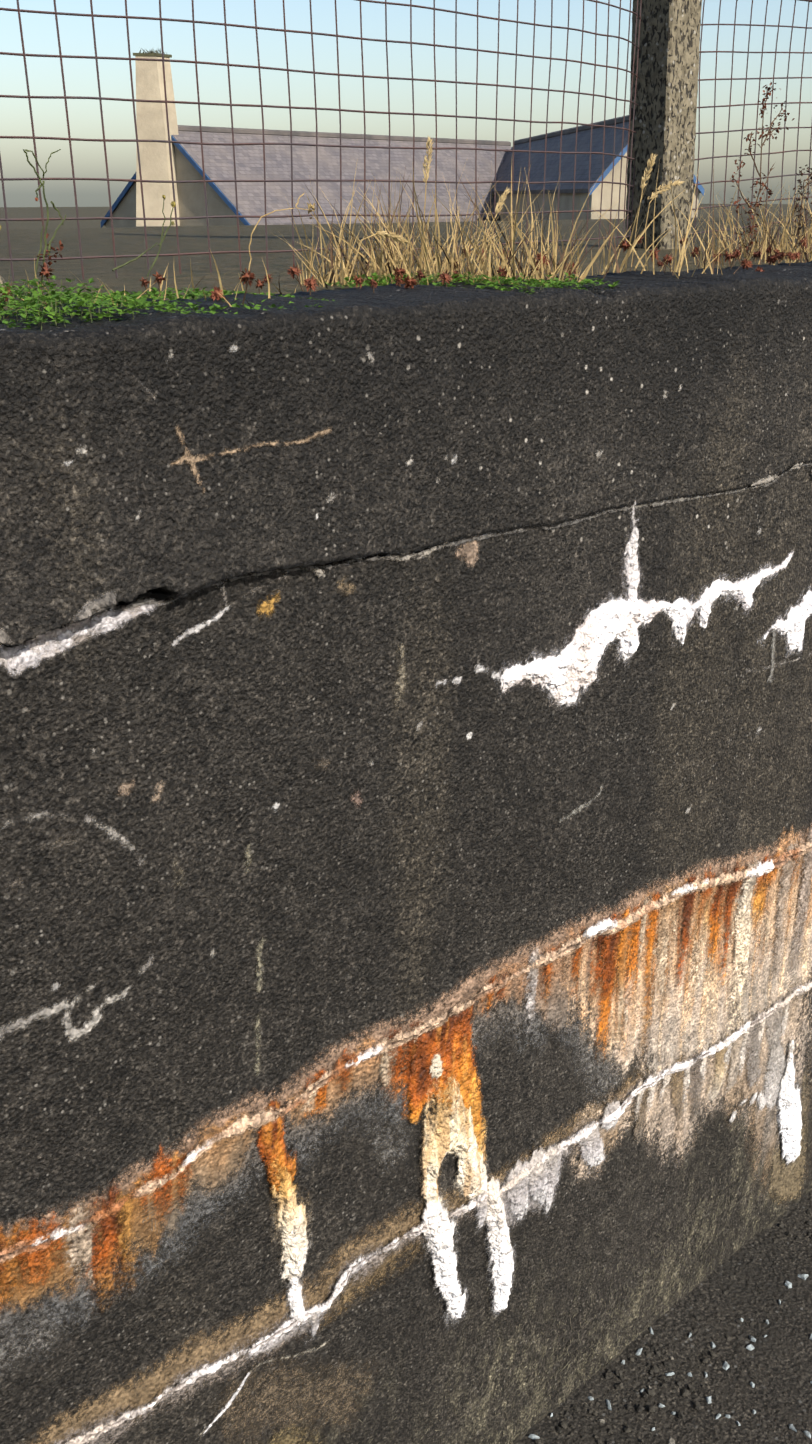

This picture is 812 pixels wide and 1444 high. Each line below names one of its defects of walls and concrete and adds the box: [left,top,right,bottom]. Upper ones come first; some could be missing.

spalling [0,591,163,673]
crack [111,460,812,646]
leakage [436,501,794,706]
crack [85,816,142,866]
corrosion [0,1113,267,1326]
leakage [257,1100,309,1321]
corrosion [282,1022,421,1162]
crack [0,825,812,1263]
leakage [301,1005,514,1319]
crack [32,970,812,1444]
corrosion [470,830,812,1084]
leakage [571,982,812,1207]